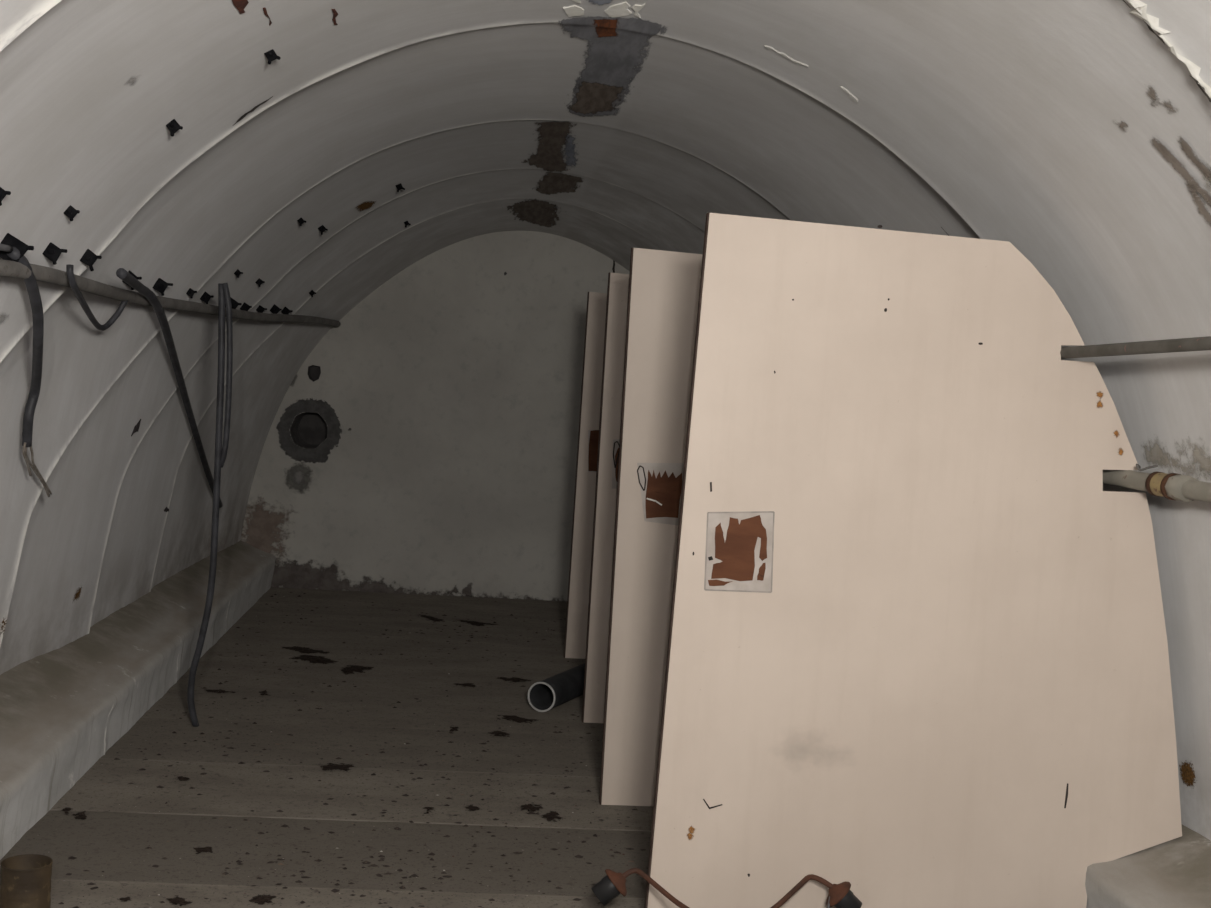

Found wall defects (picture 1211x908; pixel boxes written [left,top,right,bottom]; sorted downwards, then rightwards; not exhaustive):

corrosion [572,0,645,18]
leakage [241,500,559,601]
corrosion [1179,761,1196,786]